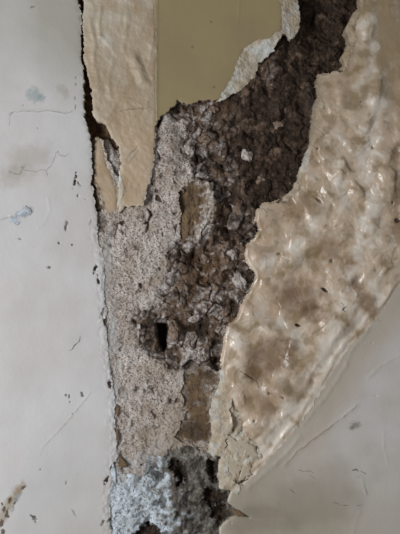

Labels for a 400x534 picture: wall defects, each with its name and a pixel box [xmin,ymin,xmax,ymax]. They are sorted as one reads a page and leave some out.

spalling [82,0,363,534]